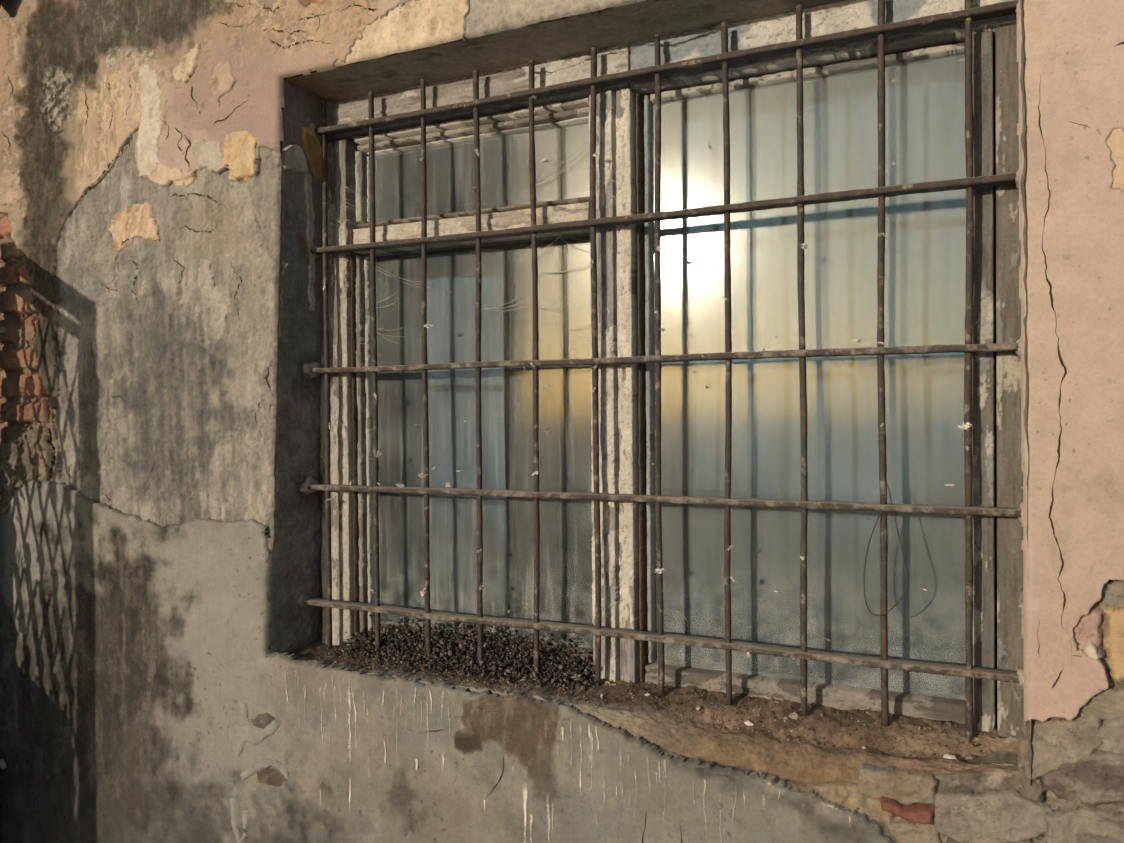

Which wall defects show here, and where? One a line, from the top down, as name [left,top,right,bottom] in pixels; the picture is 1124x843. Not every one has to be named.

water stain [14,0,232,392]
peeling [0,59,328,541]
water stain [123,282,229,501]
peeling [173,43,201,113]
peeling [256,0,646,67]
crack [1037,78,1081,688]
peeling [1107,128,1124,191]
water stain [35,522,65,546]
water stain [0,528,222,843]
water stain [321,679,357,760]
water stain [454,693,571,843]
flaking render [714,579,1124,843]